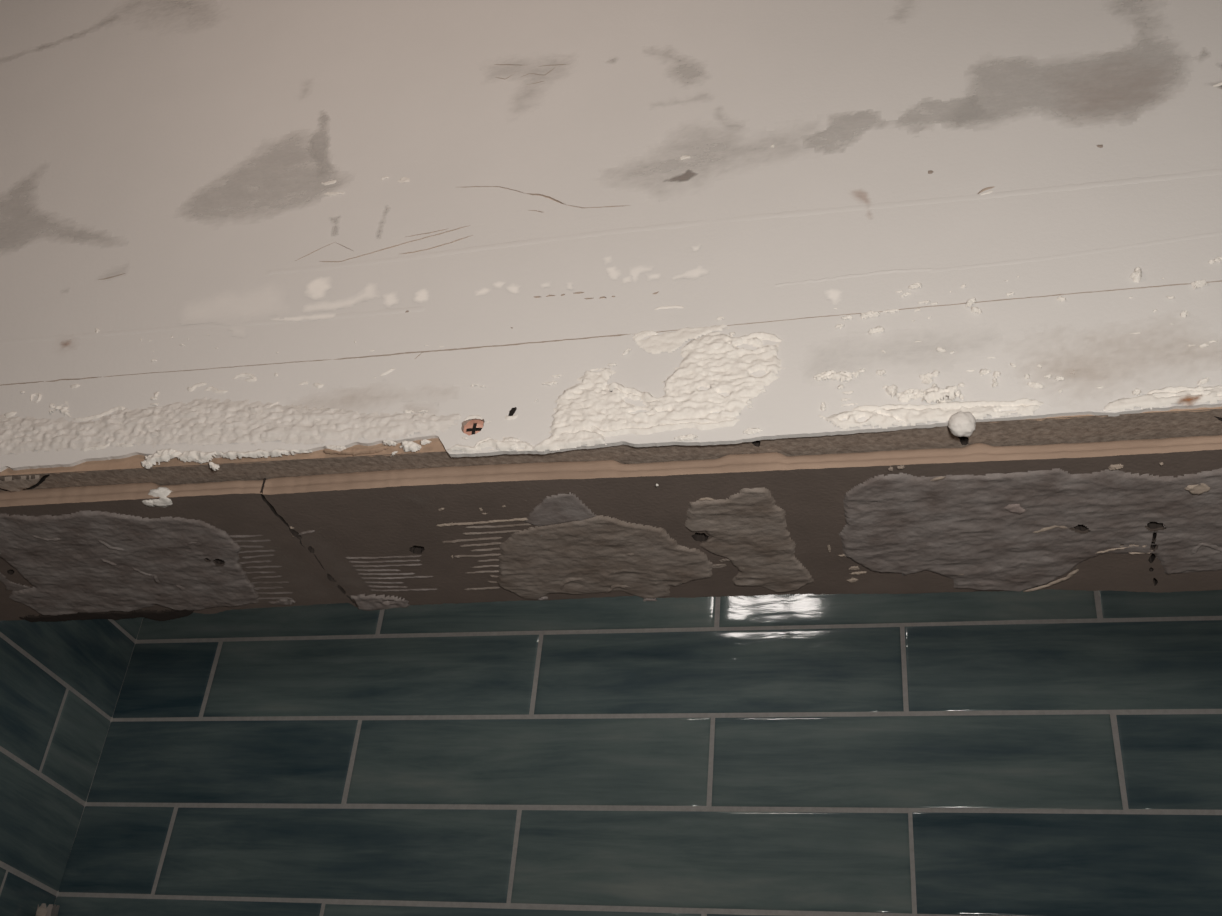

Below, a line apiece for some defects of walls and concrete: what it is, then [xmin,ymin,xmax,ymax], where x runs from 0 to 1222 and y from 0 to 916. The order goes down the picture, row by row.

spalling [447,316,785,453]
spalling [141,439,432,471]
crack [260,478,355,605]